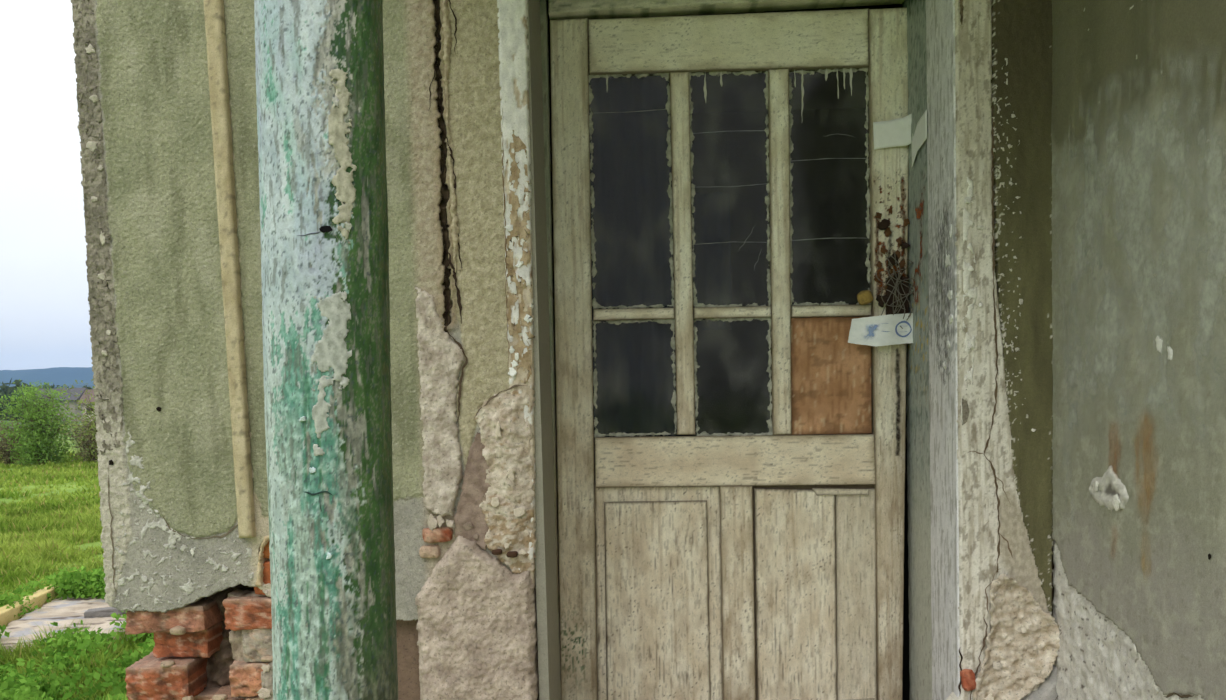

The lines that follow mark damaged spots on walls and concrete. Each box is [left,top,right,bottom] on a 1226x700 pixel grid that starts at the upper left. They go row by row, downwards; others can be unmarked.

peeling [328,68,357,243]
crack [428,0,462,332]
peeling [501,109,535,383]
corrosion [874,172,924,307]
spalling [73,0,273,700]
peeling [299,291,352,474]
peeling [415,286,491,558]
spalling [1089,465,1129,512]
spalling [958,540,1204,700]